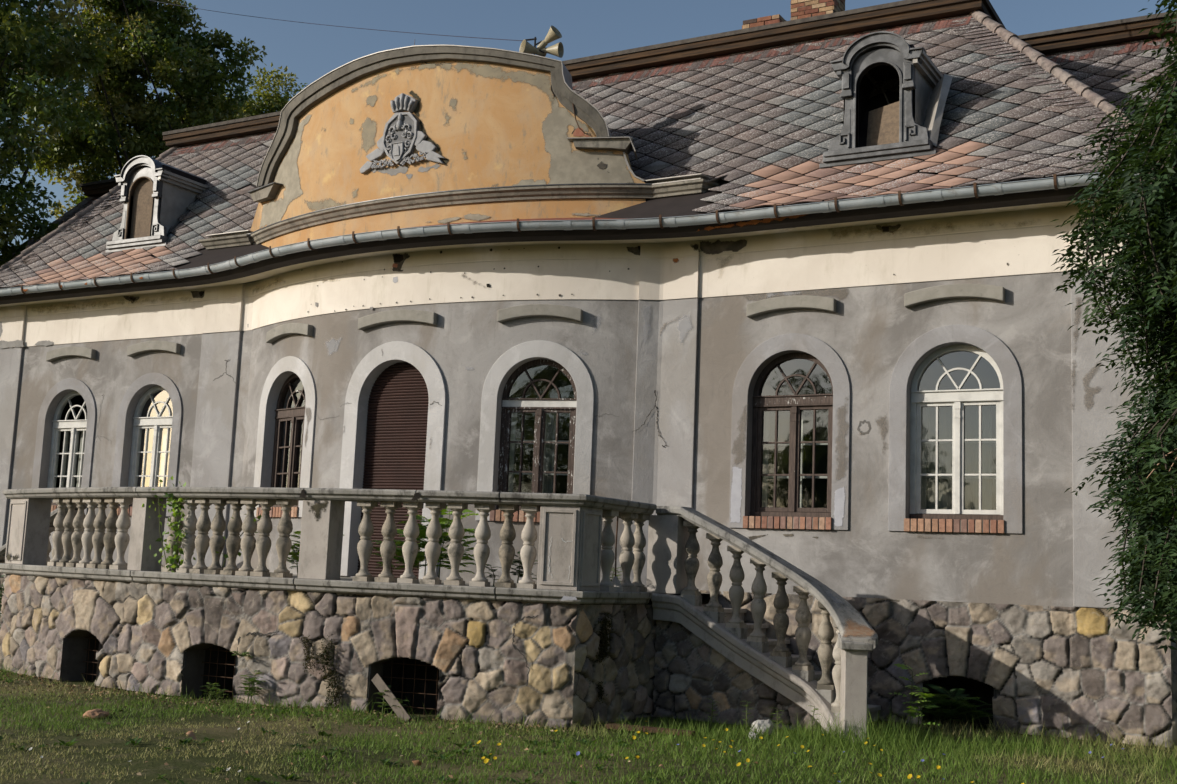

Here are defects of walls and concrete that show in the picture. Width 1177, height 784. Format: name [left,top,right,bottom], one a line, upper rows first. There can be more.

peeling [259,115,358,228]
peeling [350,62,634,186]
crack [596,390,667,447]